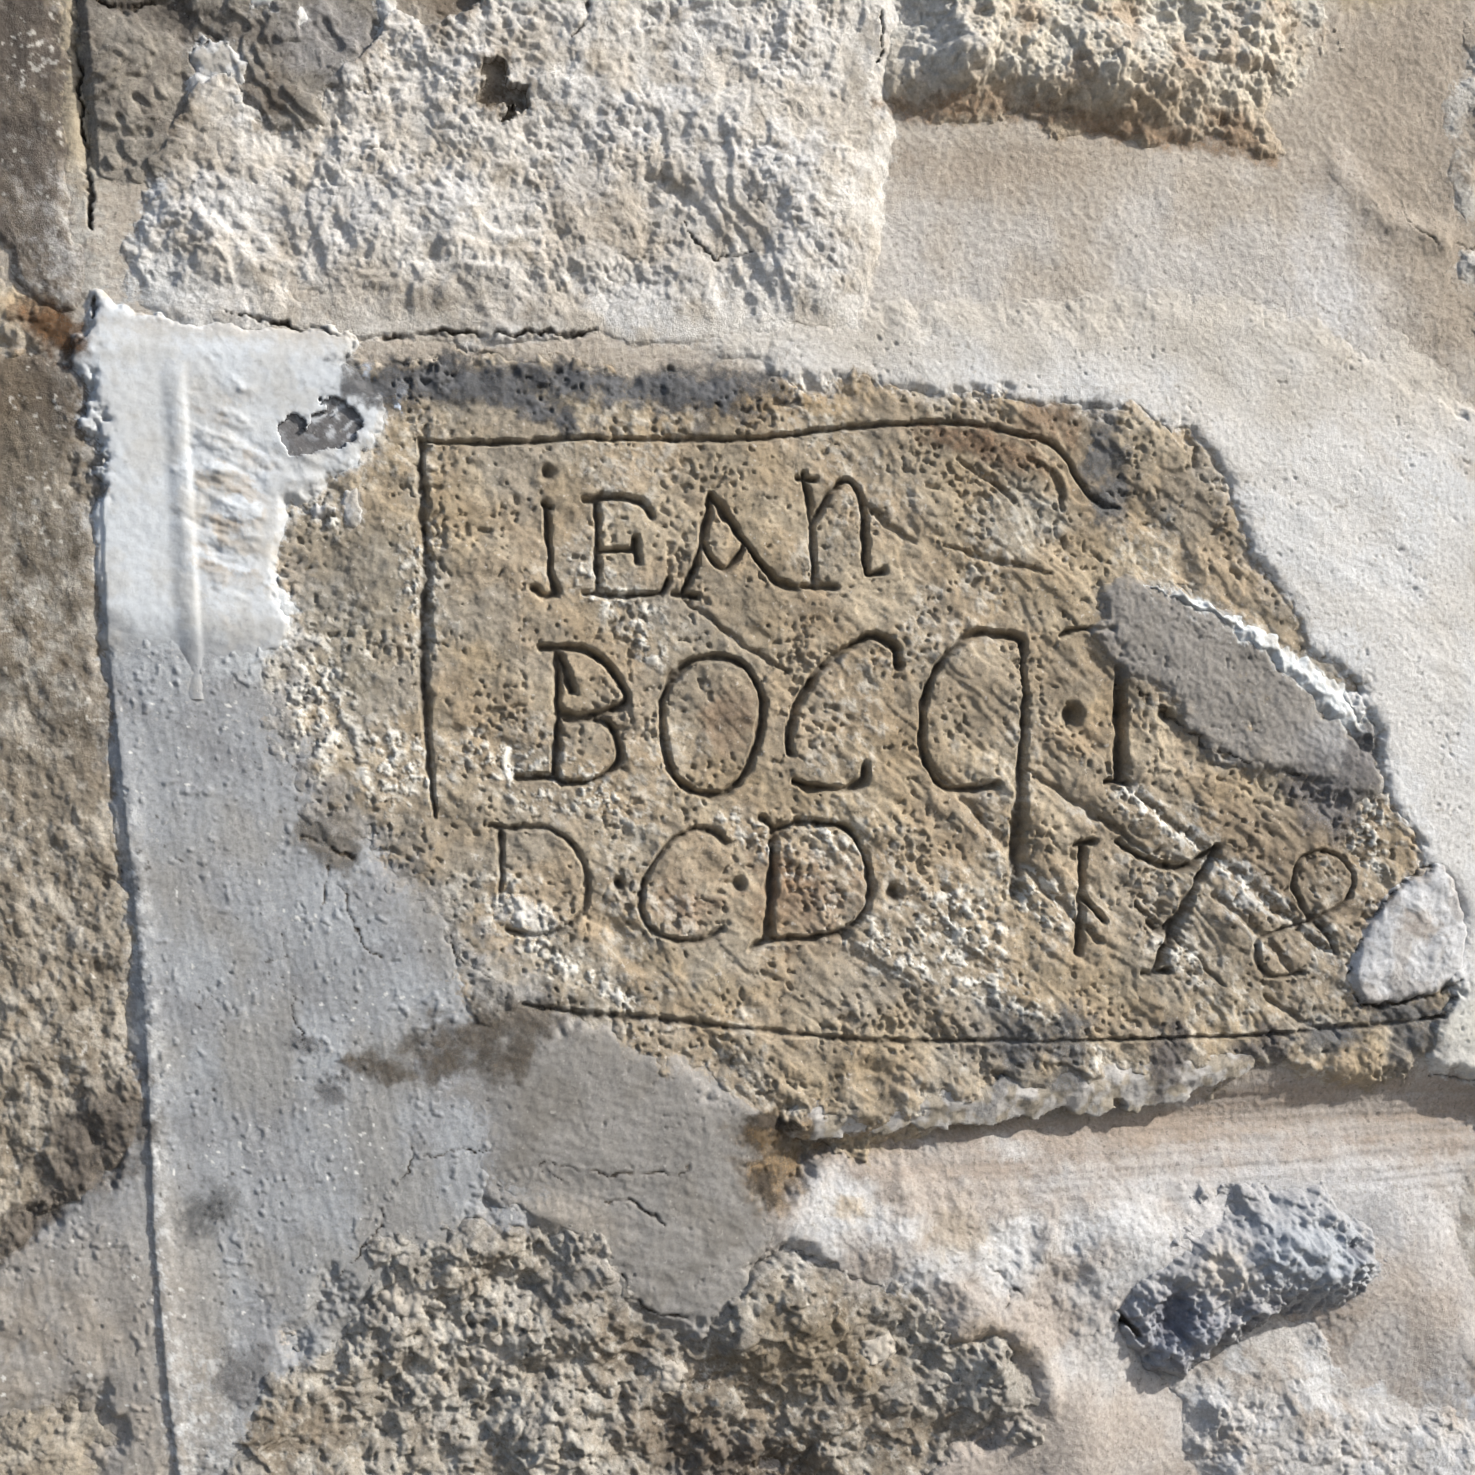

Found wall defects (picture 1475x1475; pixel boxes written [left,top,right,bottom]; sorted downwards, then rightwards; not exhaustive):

crack [75,52,95,230]
spalling [476,59,528,122]
peeling [278,397,368,456]
peeling [310,488,362,528]
crack [307,836,382,958]
crack [340,1149,483,1276]